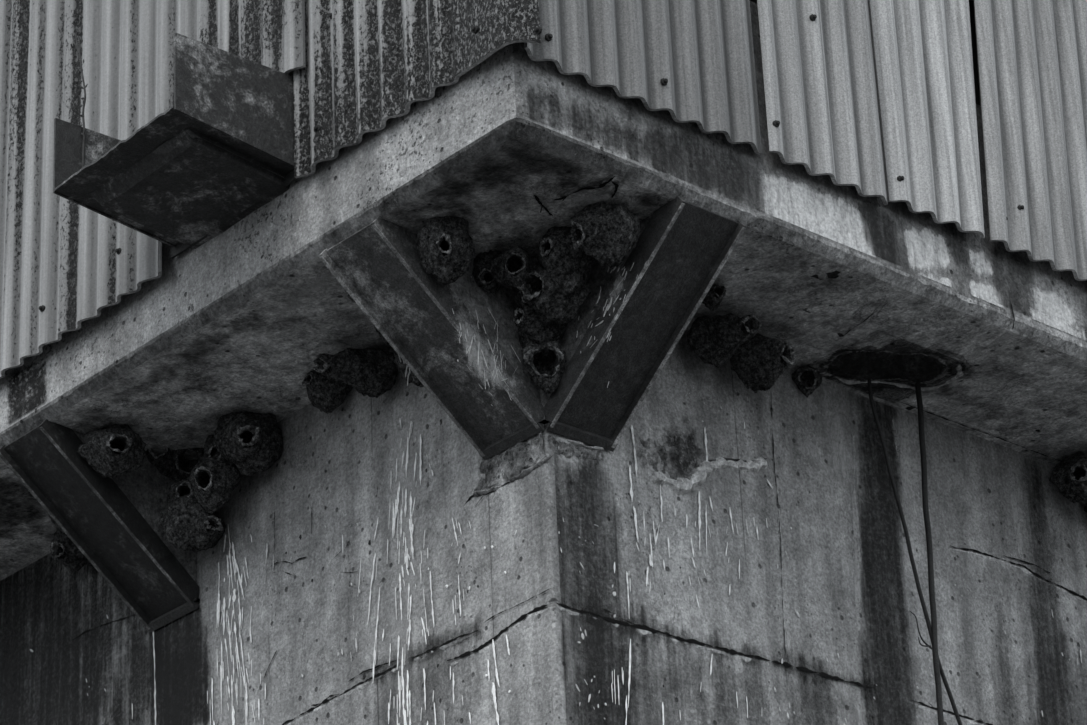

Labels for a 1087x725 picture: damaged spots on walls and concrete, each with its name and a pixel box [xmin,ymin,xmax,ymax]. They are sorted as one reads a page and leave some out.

crack [274,504,312,575]
crack [282,396,874,725]
damp [556,461,632,725]
damp [726,507,768,595]
crack [950,546,1087,602]